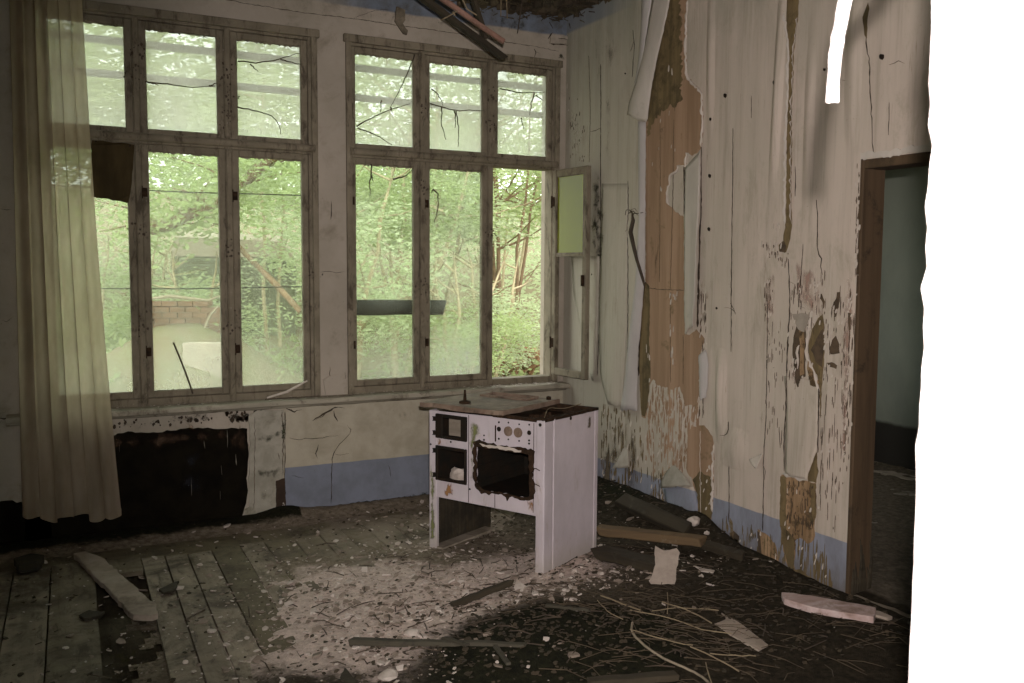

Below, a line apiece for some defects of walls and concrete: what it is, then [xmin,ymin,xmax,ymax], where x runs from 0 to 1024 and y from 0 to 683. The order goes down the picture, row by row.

peeling [571,0,832,587]
peeling [764,164,861,532]
flaking render [0,427,249,544]
flaking render [276,478,286,507]
crack [284,407,351,499]